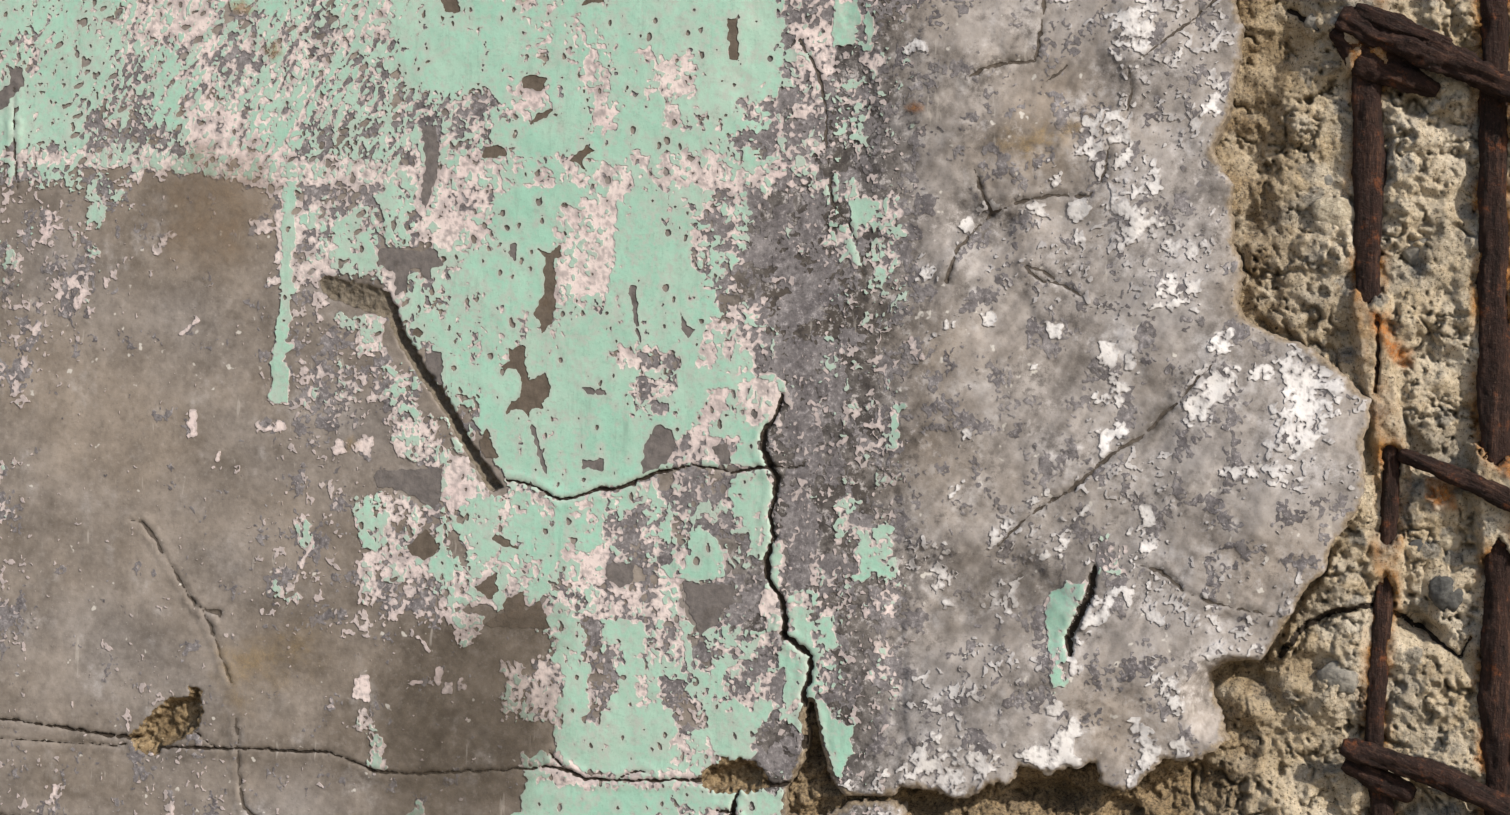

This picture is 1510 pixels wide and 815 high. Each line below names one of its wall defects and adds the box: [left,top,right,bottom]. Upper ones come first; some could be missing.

peeling [1009,0,1237,183]
peeling [944,137,1063,330]
crack [944,147,1110,284]
spalling [1329,0,1510,545]
crack [997,364,1213,547]
rust [1376,439,1397,464]
spalling [0,555,355,815]
peeling [292,659,404,799]
crack [0,393,814,815]
crack [1064,565,1097,657]
crack [1140,565,1472,658]
spalling [1340,537,1510,815]